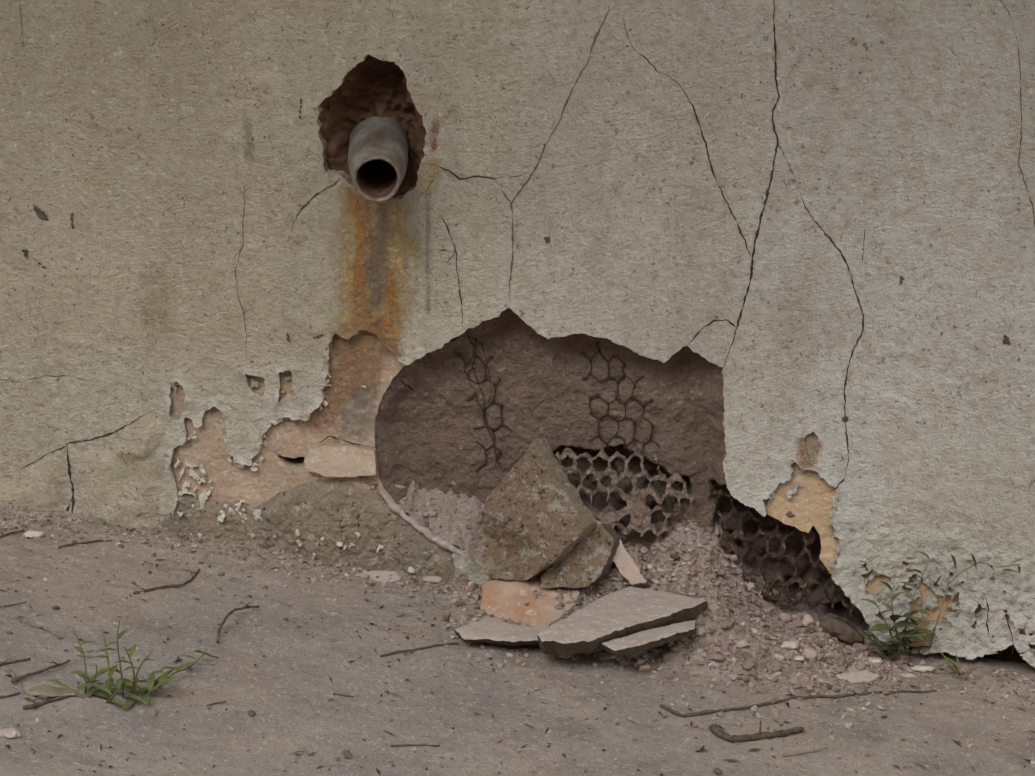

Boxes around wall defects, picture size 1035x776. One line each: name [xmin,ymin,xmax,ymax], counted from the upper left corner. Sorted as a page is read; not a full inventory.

spalling [318,55,426,198]
crack [999,0,1035,226]
crack [291,179,340,231]
crack [418,1,866,492]
crack [318,435,375,448]
flaking render [156,308,875,641]
peeling [851,555,961,647]
peeling [972,597,985,643]
peeling [1004,602,1035,649]